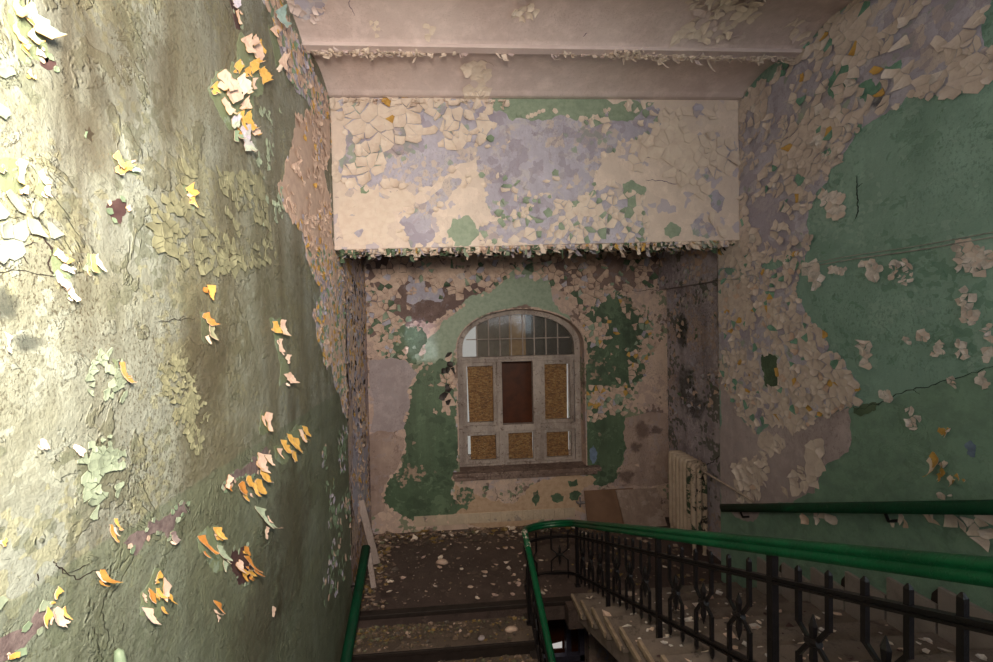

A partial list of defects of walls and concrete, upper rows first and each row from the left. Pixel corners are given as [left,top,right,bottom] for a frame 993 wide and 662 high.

peeling [0,0,67,80]
peeling [0,157,107,302]
flaking render [106,195,132,224]
crack [854,176,862,219]
peeling [146,0,993,607]
peeling [85,347,135,403]
crack [856,366,993,410]
peeling [73,435,127,520]
flaking render [109,500,191,556]
flaking render [0,586,73,662]
peeling [96,570,121,586]
peeling [140,568,177,625]